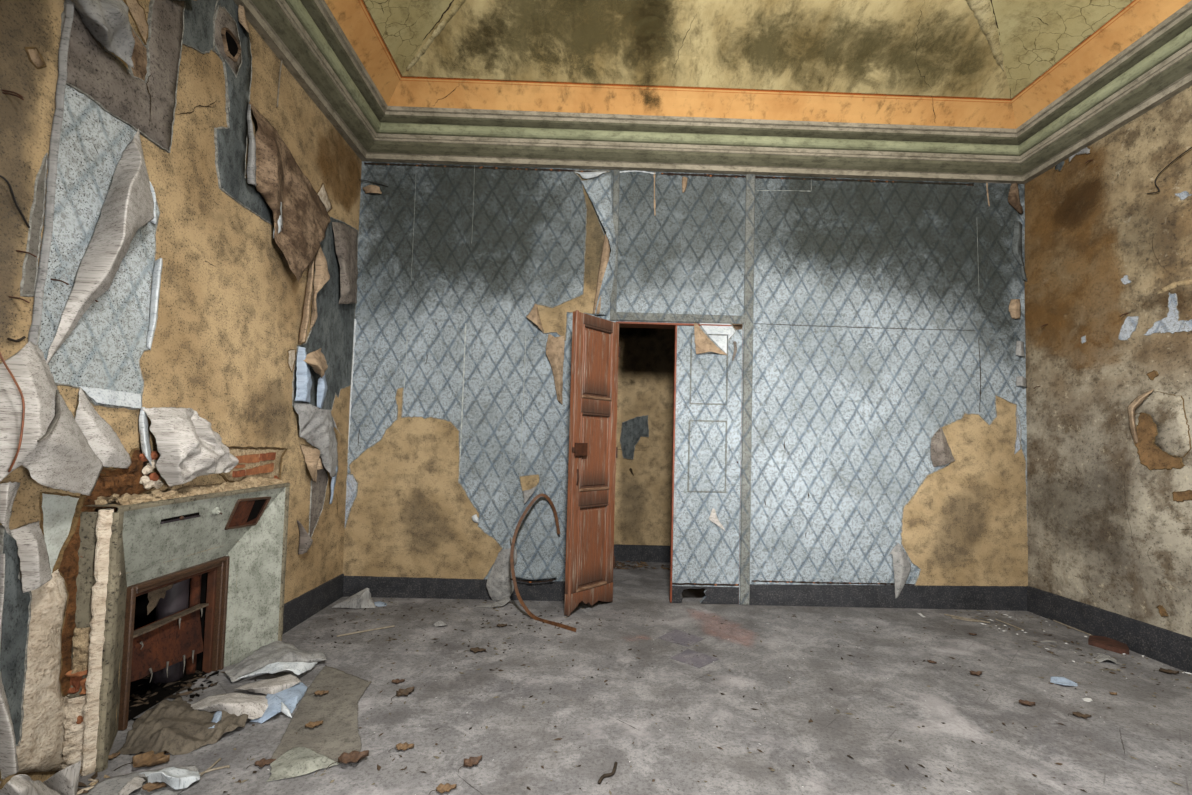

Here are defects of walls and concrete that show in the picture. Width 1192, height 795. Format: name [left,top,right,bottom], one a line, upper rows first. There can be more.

spalling [24,47,47,69]
spalling [213,5,242,78]
crack [423,0,454,40]
water stain [459,0,677,75]
water stain [734,15,981,89]
spalling [317,183,332,212]
peeling [1127,370,1191,470]
peeling [343,387,503,579]
peeling [900,395,1028,586]
spalling [16,448,164,776]